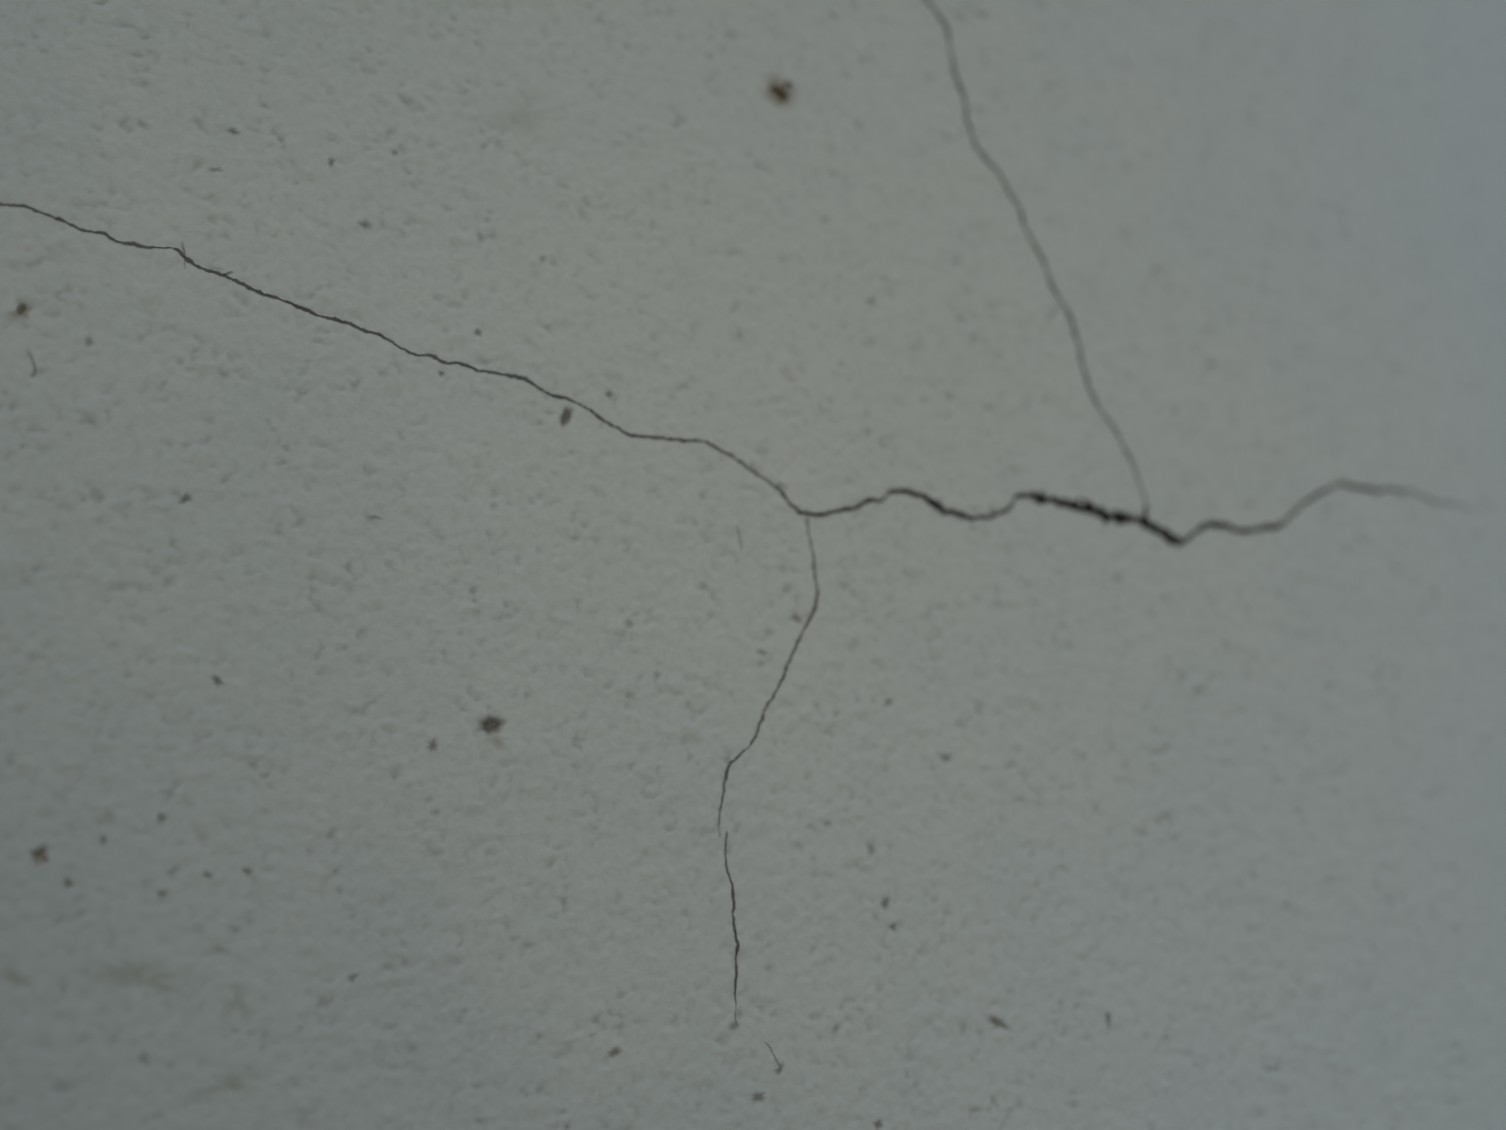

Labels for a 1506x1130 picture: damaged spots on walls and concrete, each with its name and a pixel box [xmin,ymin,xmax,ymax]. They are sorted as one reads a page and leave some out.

crack [0,0,1433,813]
crack [724,832,739,1004]